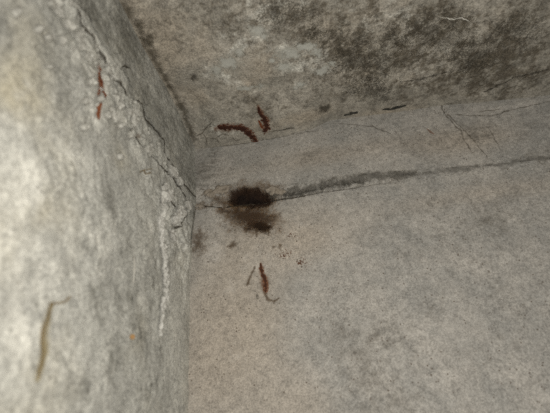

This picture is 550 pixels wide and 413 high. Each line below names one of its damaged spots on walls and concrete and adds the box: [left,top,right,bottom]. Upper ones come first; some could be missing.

crack [77,3,107,63]
leakage [268,42,321,74]
rust [96,65,107,120]
crack [113,65,250,229]
rust [217,123,258,142]
rust [257,107,271,135]
leakage [218,193,277,237]
rust [246,263,279,302]